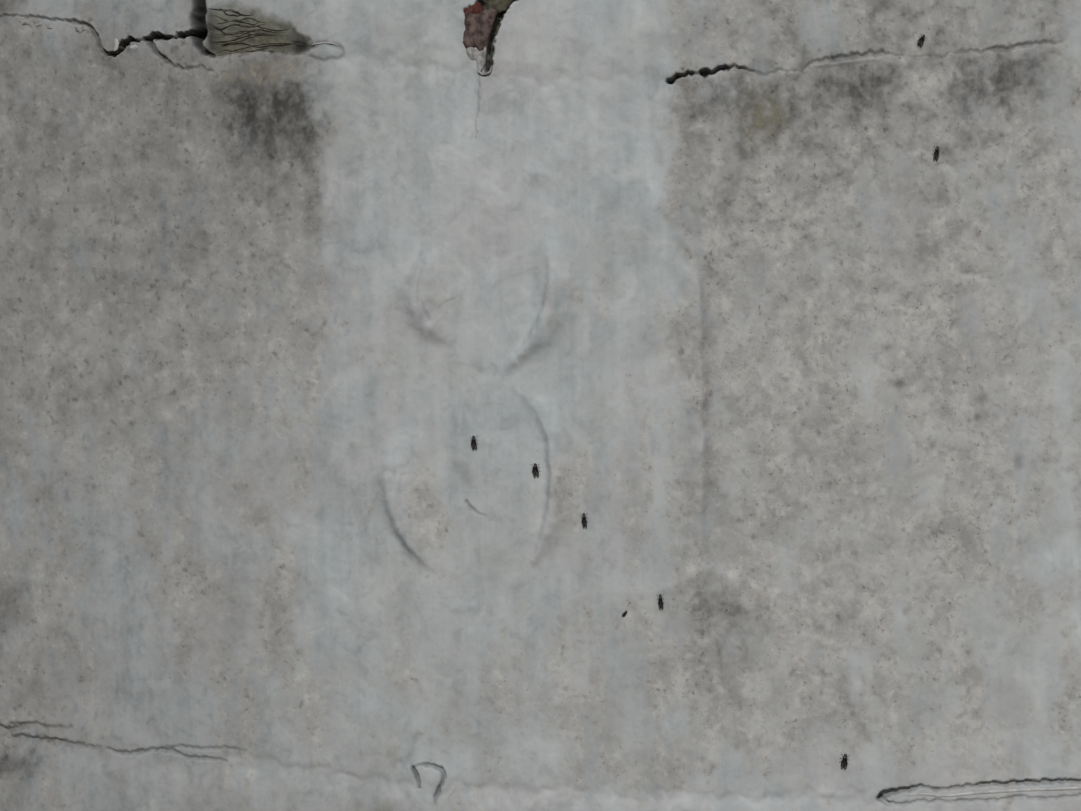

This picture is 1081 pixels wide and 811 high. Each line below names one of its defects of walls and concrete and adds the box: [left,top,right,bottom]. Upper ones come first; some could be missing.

crack [0,0,214,73]
spalling [203,0,346,63]
peeling [462,0,519,76]
crack [665,39,1065,86]
crack [0,720,247,761]
crack [410,762,447,808]
crack [875,778,1081,809]